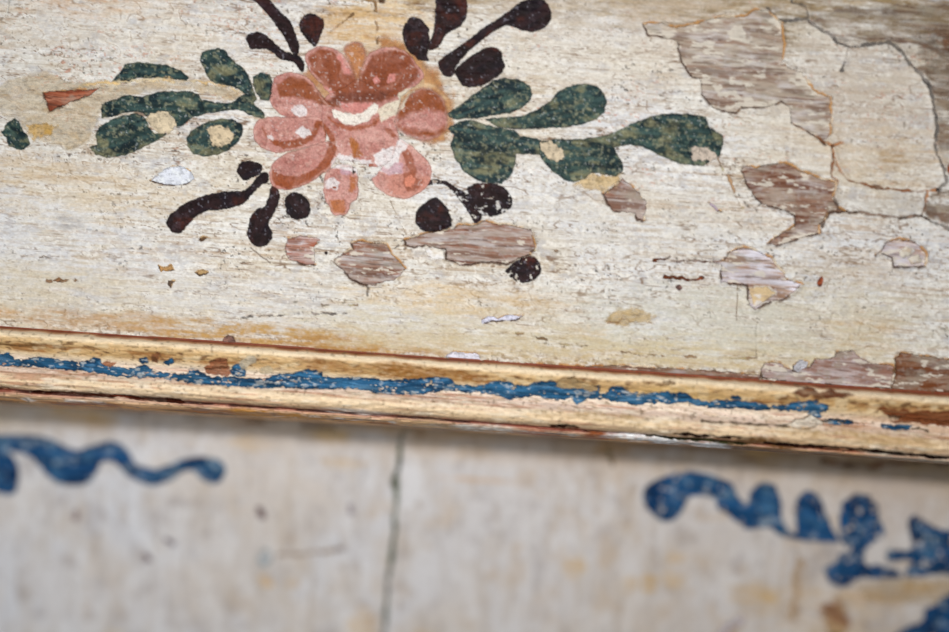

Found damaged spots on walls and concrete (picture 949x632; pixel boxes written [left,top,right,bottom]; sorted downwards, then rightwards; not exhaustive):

peeling [643,8,833,145]
crack [767,0,949,232]
peeling [602,178,647,222]
crack [717,158,744,209]
peeling [285,236,320,266]
peeling [333,239,406,286]
peeling [403,220,536,266]
crack [652,256,708,281]
peeling [714,161,846,310]
peeling [875,237,928,268]
peeling [556,350,949,393]
crack [383,436,402,629]